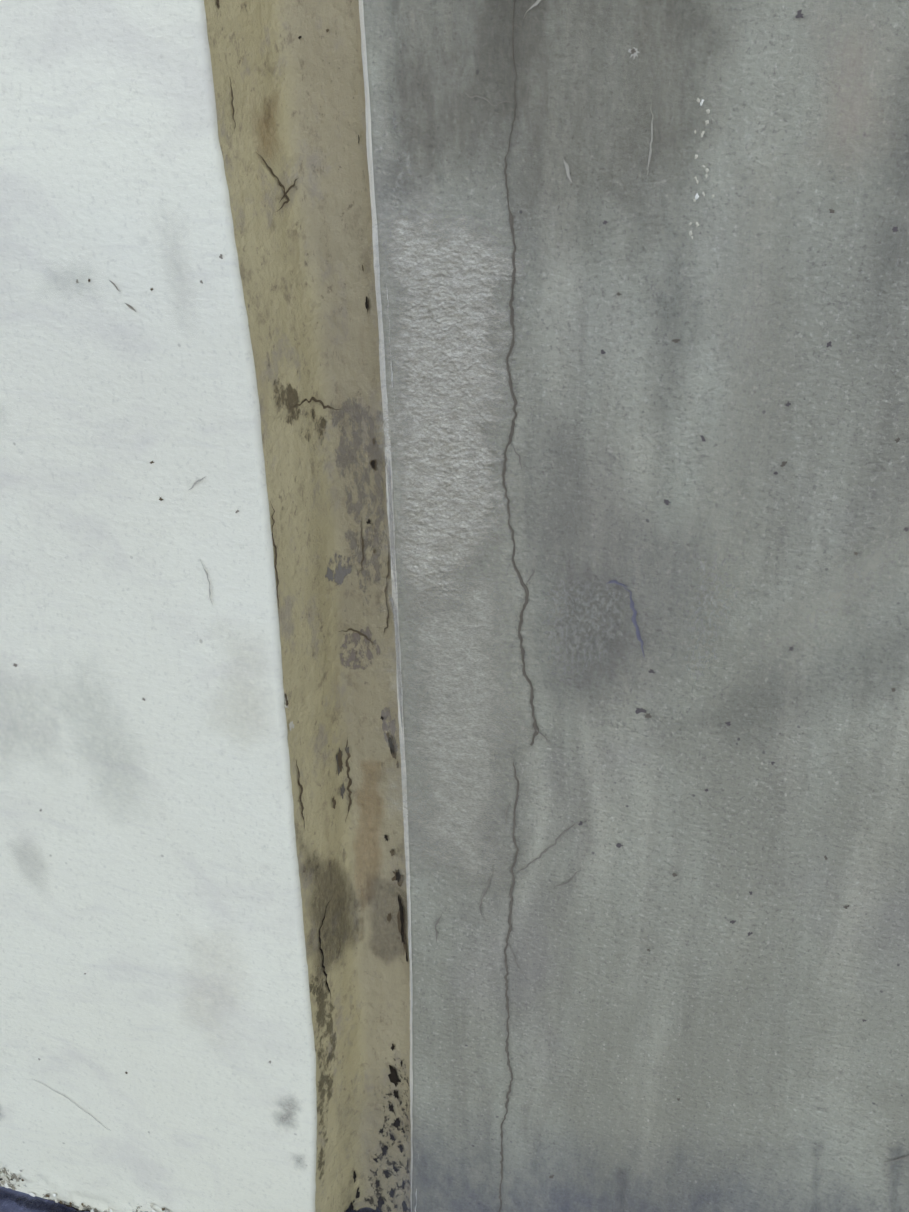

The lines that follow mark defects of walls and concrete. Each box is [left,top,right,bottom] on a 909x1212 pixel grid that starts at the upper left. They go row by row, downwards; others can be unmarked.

mould [350,1044,410,1212]
crack [465,0,584,1212]